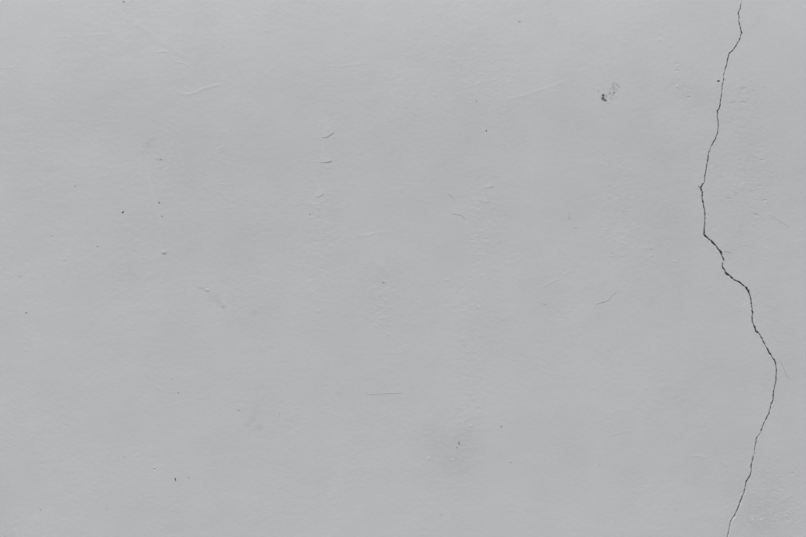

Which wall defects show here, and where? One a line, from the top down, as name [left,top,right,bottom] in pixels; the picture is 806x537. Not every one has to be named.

crack [696,0,791,537]